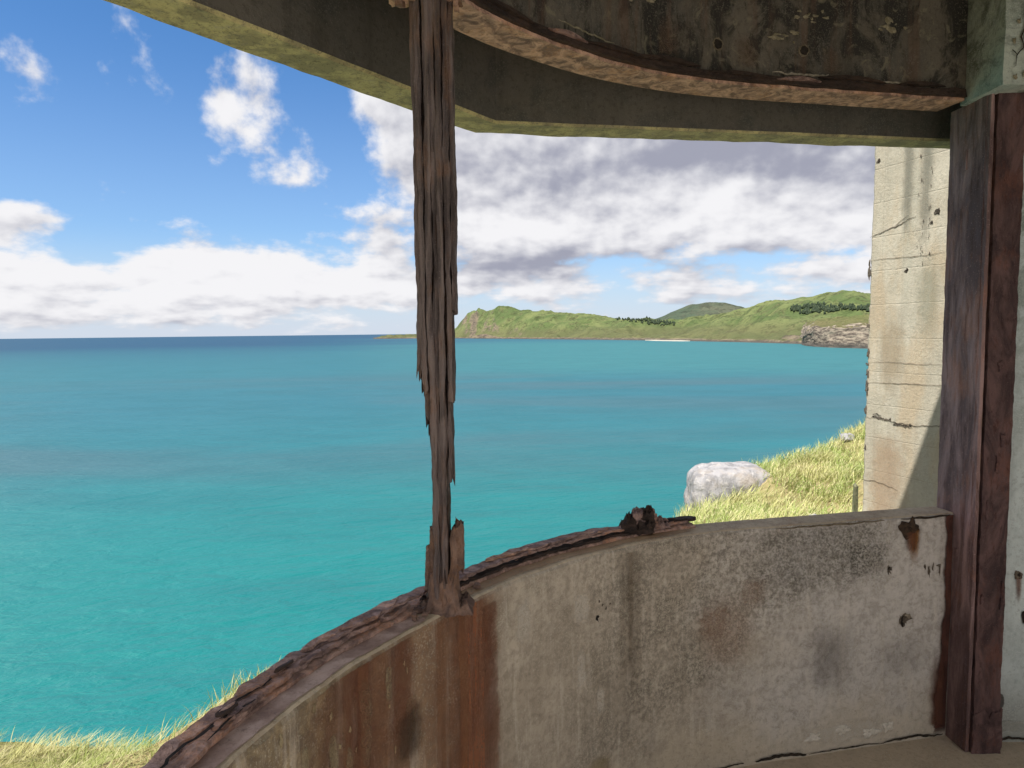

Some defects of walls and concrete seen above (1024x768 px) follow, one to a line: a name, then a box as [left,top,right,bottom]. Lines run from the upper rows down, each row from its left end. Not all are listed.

crack [870,217,944,261]
corrosion [140,0,696,768]
crack [865,413,939,428]
corrosion [898,516,920,554]
crack [722,734,943,768]